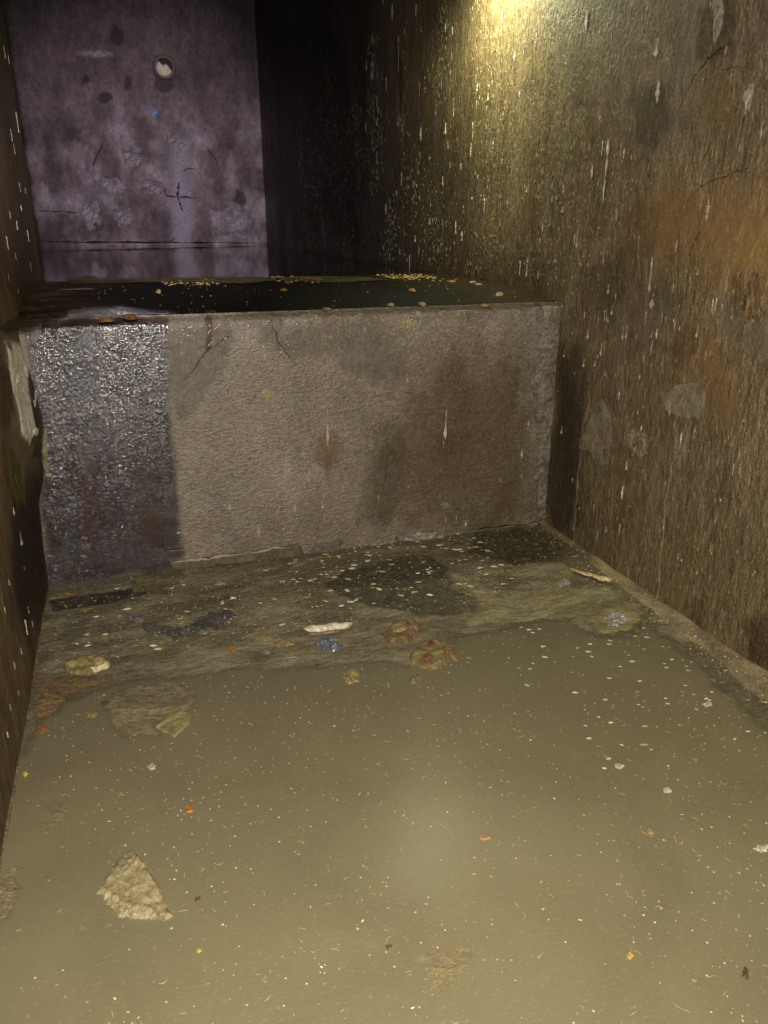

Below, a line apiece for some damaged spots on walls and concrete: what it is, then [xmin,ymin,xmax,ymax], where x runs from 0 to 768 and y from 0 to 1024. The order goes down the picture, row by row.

crack [678,43,754,116]
crack [164,150,220,211]
crack [687,142,748,201]
crack [187,336,232,378]
peeling [660,379,706,420]
peeling [579,399,648,473]